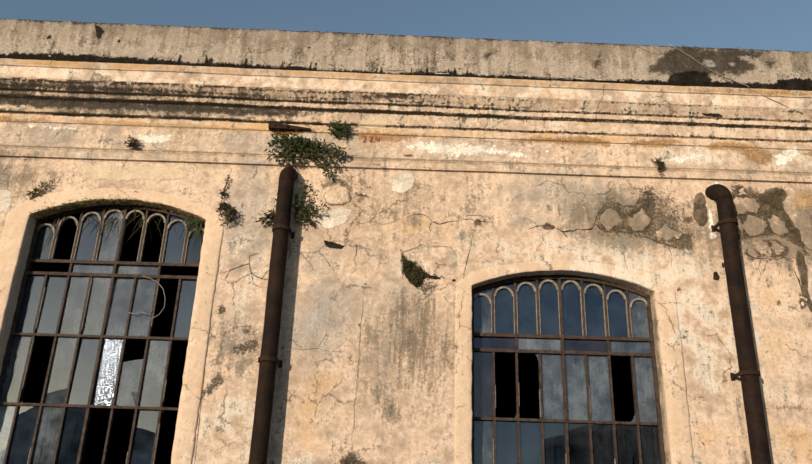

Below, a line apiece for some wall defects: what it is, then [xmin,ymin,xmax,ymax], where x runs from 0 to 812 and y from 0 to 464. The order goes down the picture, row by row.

leakage [0,46,812,95]
crack [220,253,269,288]
crack [353,204,495,279]
spalling [595,185,696,253]
spalling [731,181,812,259]
leakage [759,187,812,312]
spalling [335,452,366,464]